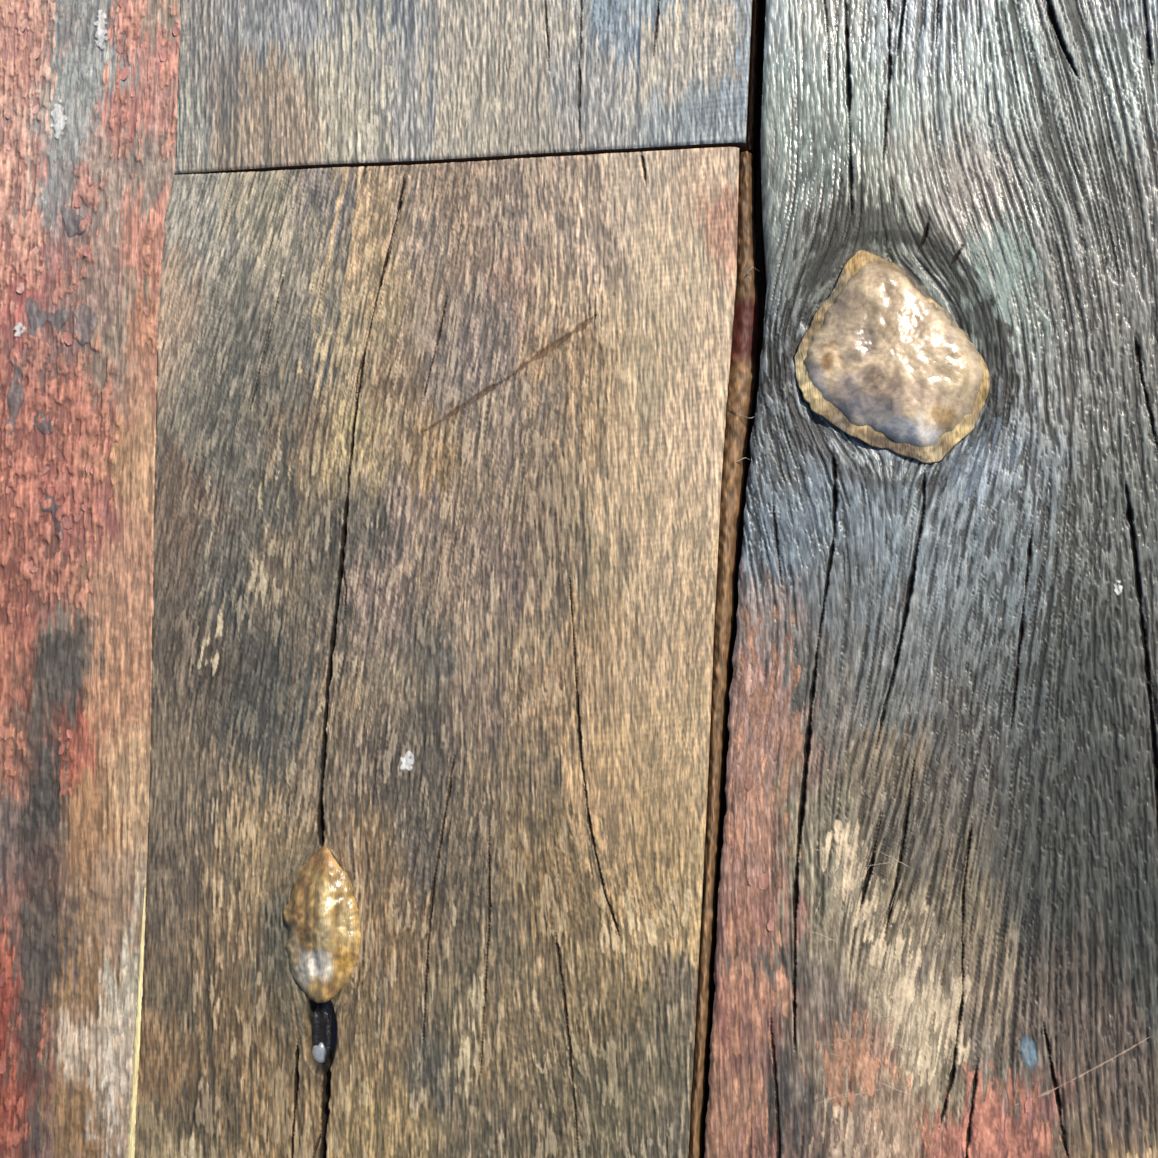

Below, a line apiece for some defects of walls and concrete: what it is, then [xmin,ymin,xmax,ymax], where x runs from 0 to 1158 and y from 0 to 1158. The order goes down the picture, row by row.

crack [1046,0,1078,77]
peeling [0,0,180,623]
crack [317,176,404,846]
crack [570,582,618,931]
crack [771,451,837,1158]
crack [860,767,914,928]
crack [877,471,925,743]
crack [1126,487,1158,815]
crack [292,1009,333,1158]